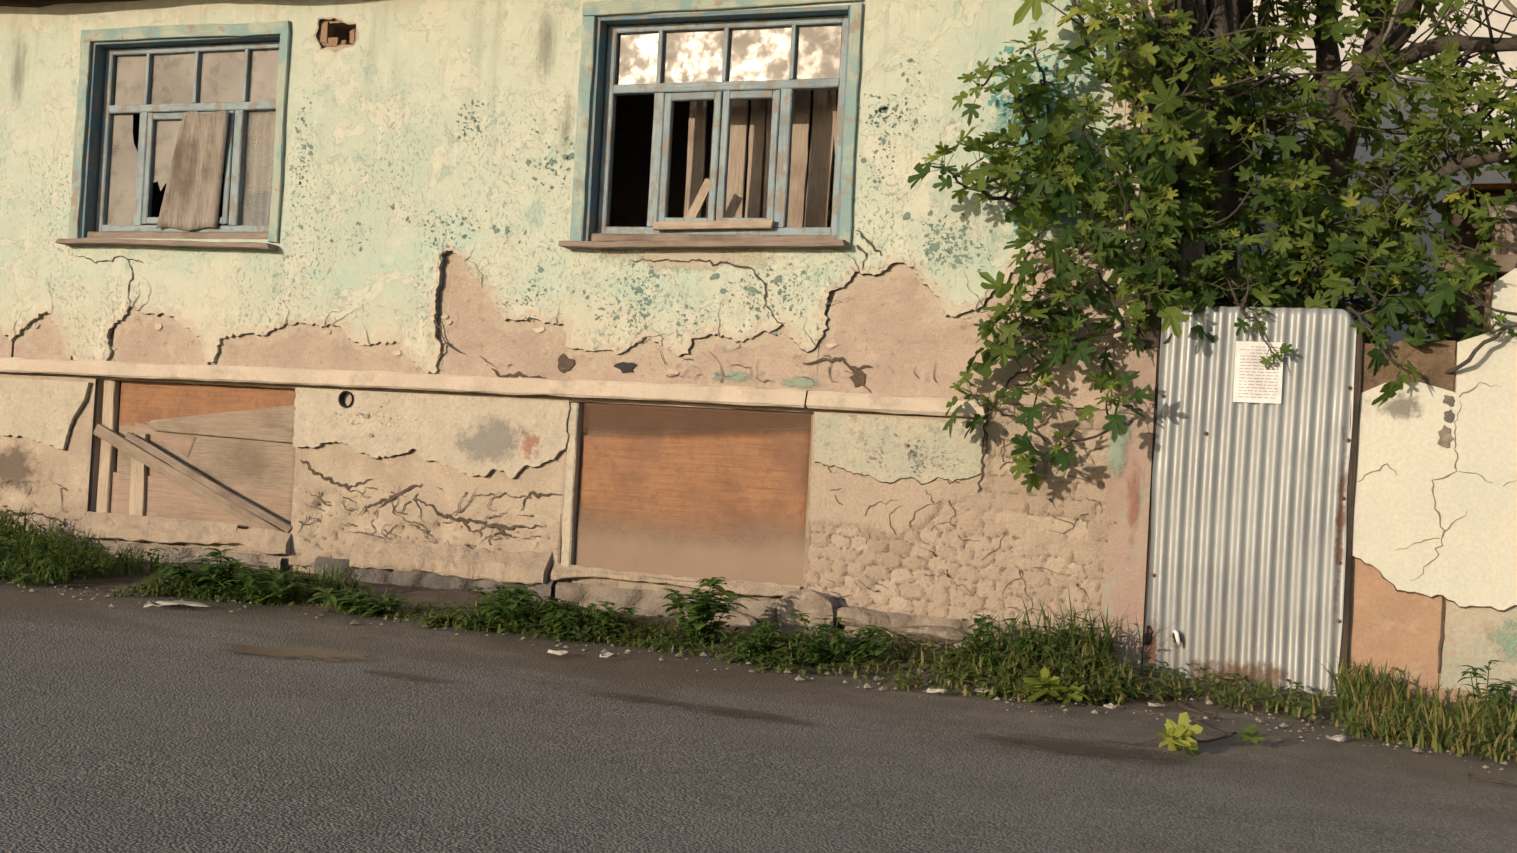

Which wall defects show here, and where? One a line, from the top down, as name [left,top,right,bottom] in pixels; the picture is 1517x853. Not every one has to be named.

spalling [314,17,359,54]
peeling [512,109,575,192]
spalling [0,292,96,547]
spalling [109,204,1129,649]
corrosion [1336,476,1346,561]
crack [1357,382,1516,581]
spalling [1437,395,1455,448]
spalling [1348,555,1517,703]